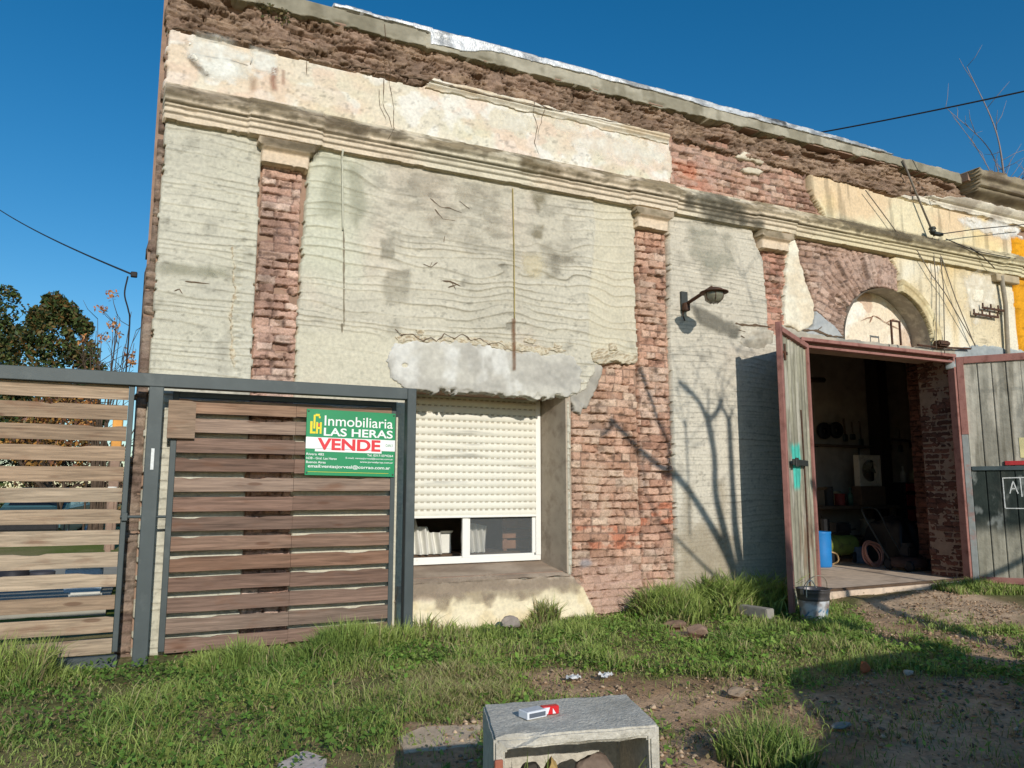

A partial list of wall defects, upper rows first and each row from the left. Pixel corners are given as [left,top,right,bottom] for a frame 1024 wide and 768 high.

crack [173,24,669,154]
spalling [164,0,966,215]
spalling [251,165,302,381]
crack [424,198,468,289]
spalling [760,239,898,341]
spalling [248,416,293,441]
spalling [250,393,293,404]
spalling [570,230,675,614]
spalling [244,511,290,535]
spalling [245,472,292,497]
spalling [239,606,287,633]
spalling [241,586,288,594]